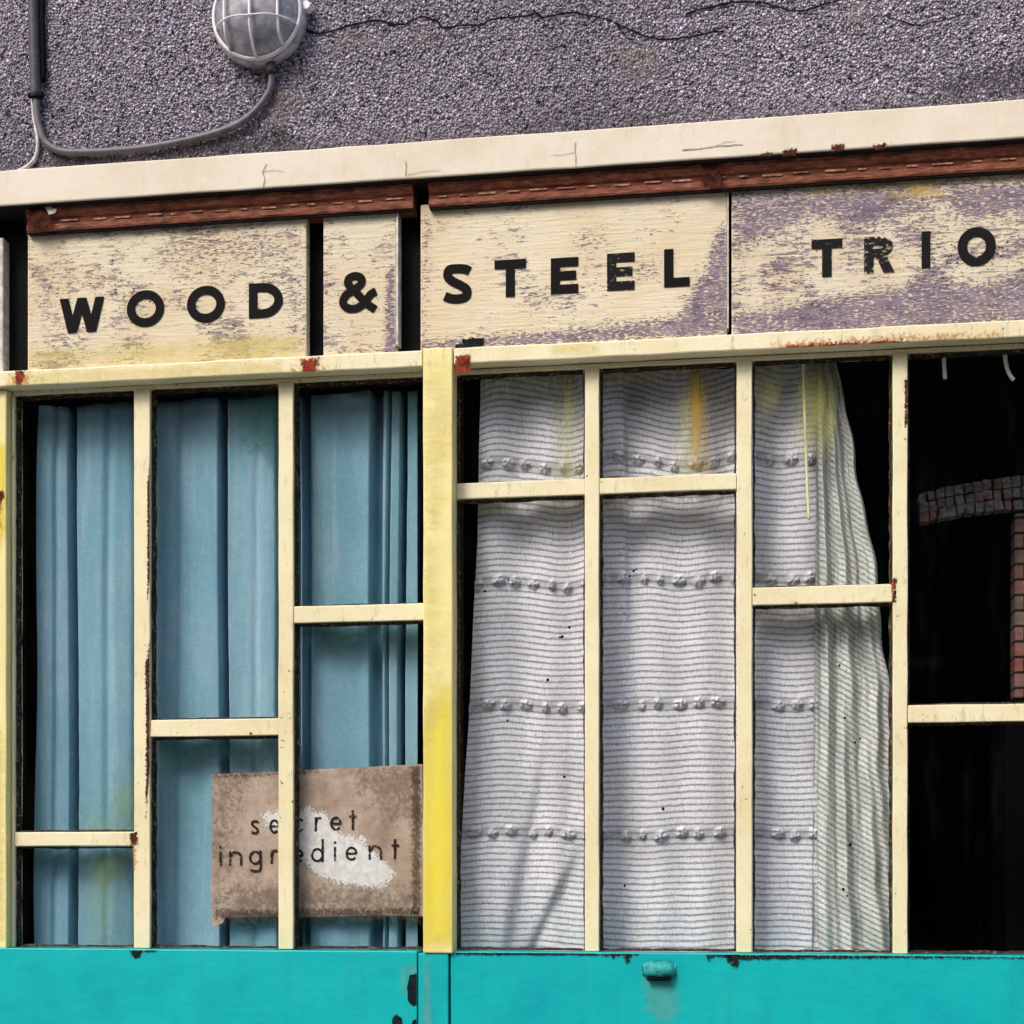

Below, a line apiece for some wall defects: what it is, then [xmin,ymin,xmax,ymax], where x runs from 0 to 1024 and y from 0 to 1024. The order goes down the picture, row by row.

crack [307,0,839,45]
crack [888,14,978,26]
peeling [25,207,57,234]
peeling [421,162,1024,351]
peeling [145,223,306,344]
peeling [29,268,57,333]
corrosion [772,331,999,354]
corrosion [13,370,28,385]
corrosion [290,357,325,373]
corrosion [455,354,471,374]
corrosion [129,832,138,870]
peeling [407,973,417,1006]